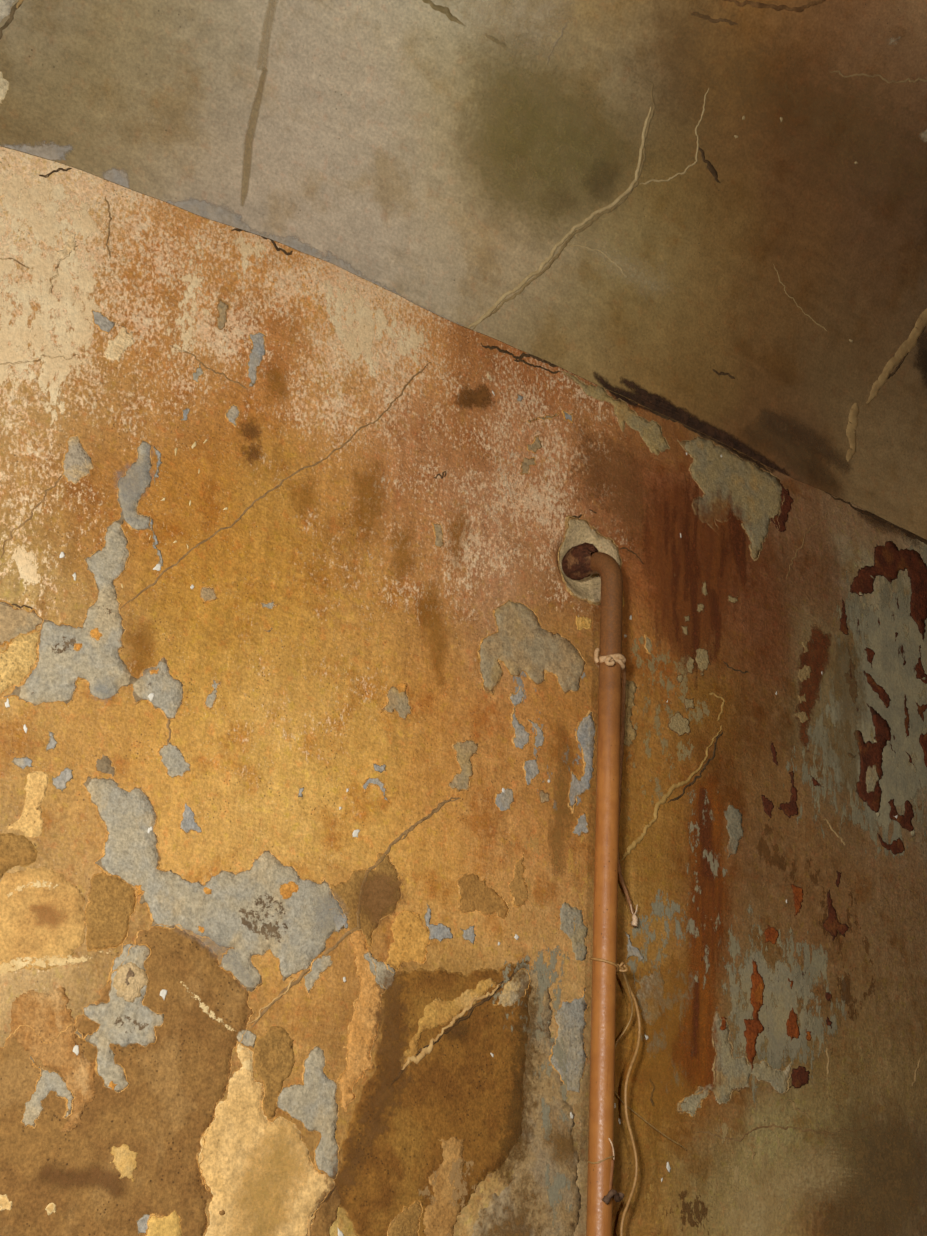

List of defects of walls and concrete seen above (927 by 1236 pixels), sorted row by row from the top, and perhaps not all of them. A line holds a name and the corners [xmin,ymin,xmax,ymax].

crack [463,75,720,374]
peeling [0,439,184,720]
peeling [190,585,219,602]
peeling [561,371,794,561]
rust [645,486,746,678]
peeling [761,541,927,865]
flaking render [0,600,596,1236]
rust [673,783,729,1087]
peeling [625,871,849,1118]
crack [306,1185,341,1236]
damp [666,1119,846,1236]